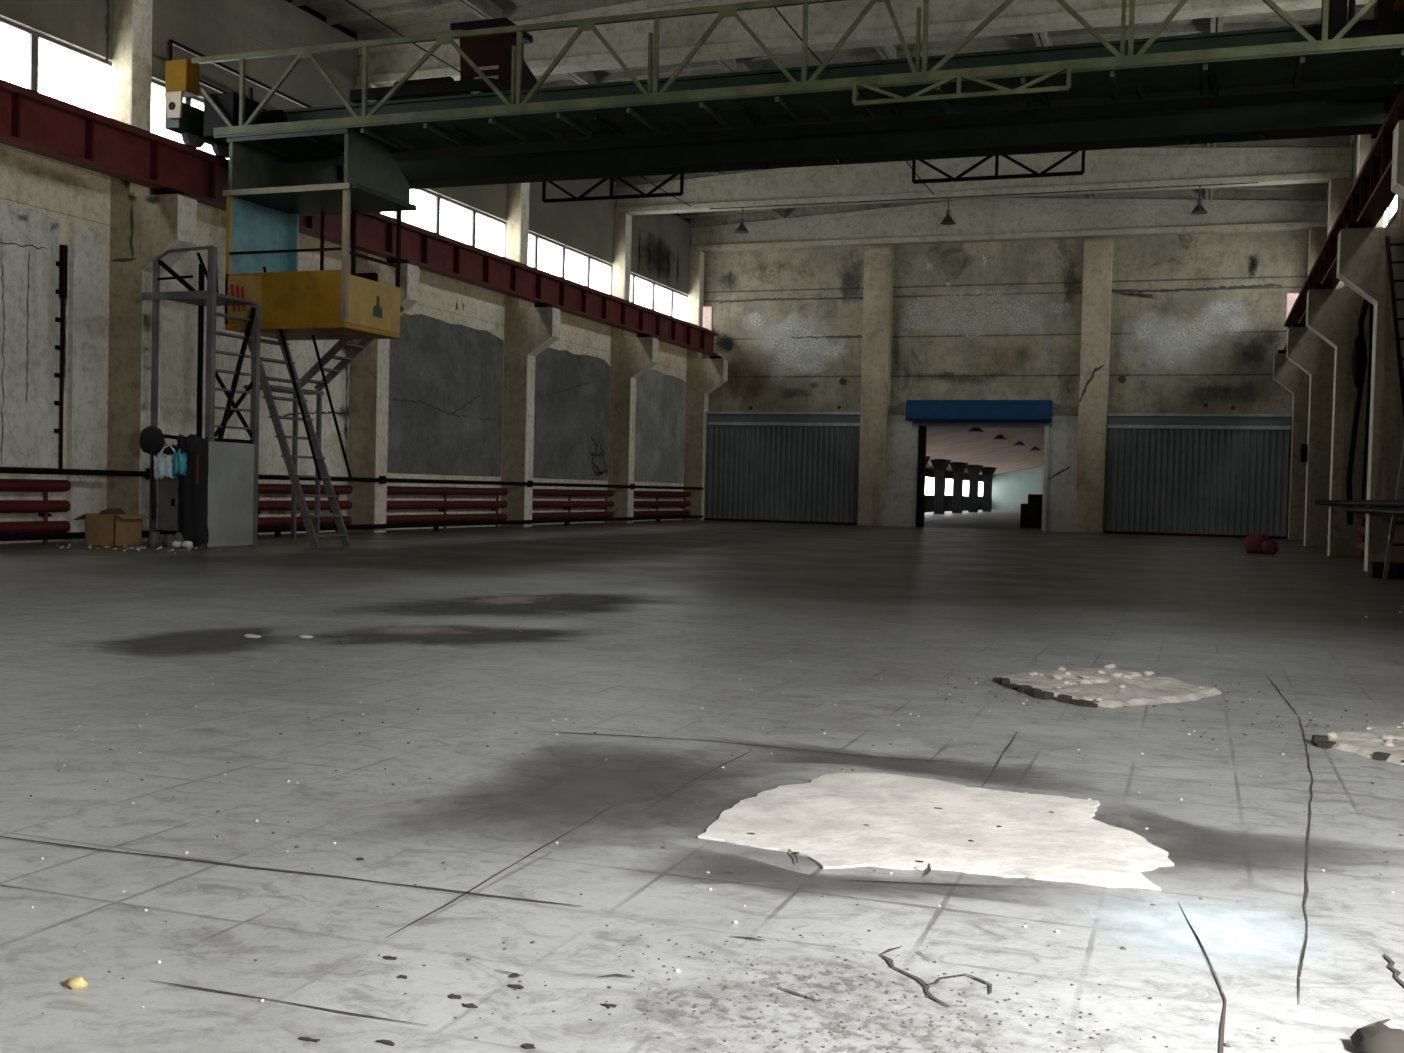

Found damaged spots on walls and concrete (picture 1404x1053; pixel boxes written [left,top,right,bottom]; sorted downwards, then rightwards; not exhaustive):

leakage [318,626,573,644]
spalling [993,677,1098,708]
spalling [1311,735,1336,749]
spalling [1373,752,1404,763]
crack [1267,676,1313,1003]
crack [880,946,992,1007]
crack [1178,902,1227,1053]